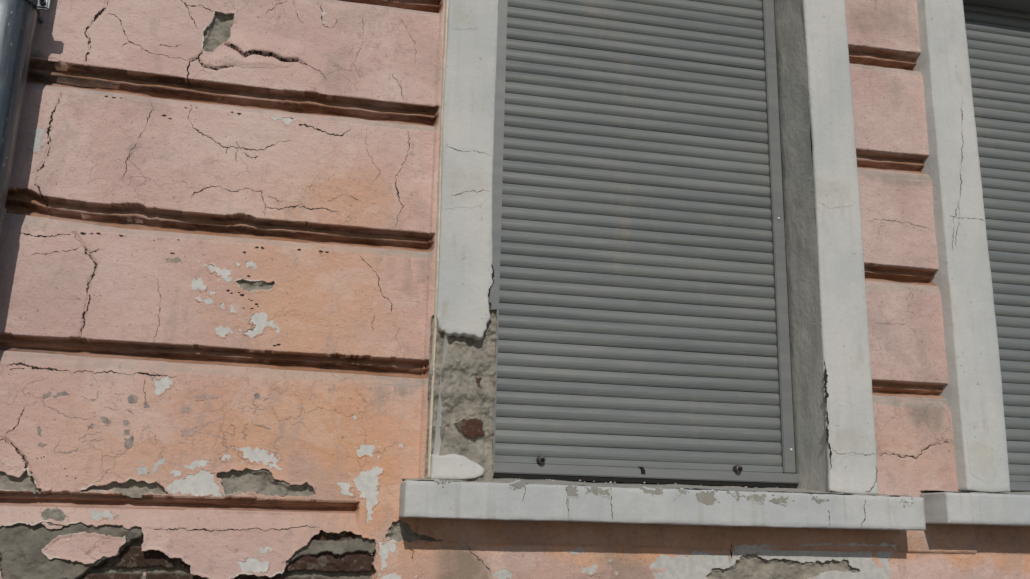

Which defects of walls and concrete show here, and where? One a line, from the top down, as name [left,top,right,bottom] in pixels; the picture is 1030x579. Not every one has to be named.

flaking render [200,9,238,54]
crack [19,93,98,338]
crack [84,0,410,227]
crack [952,100,982,255]
peeling [191,246,289,346]
crack [7,362,172,401]
peeling [127,376,175,408]
flaking render [0,442,319,579]
flaking render [227,440,446,579]
flaking render [424,309,498,488]
peeling [648,541,898,579]
crack [824,361,948,525]